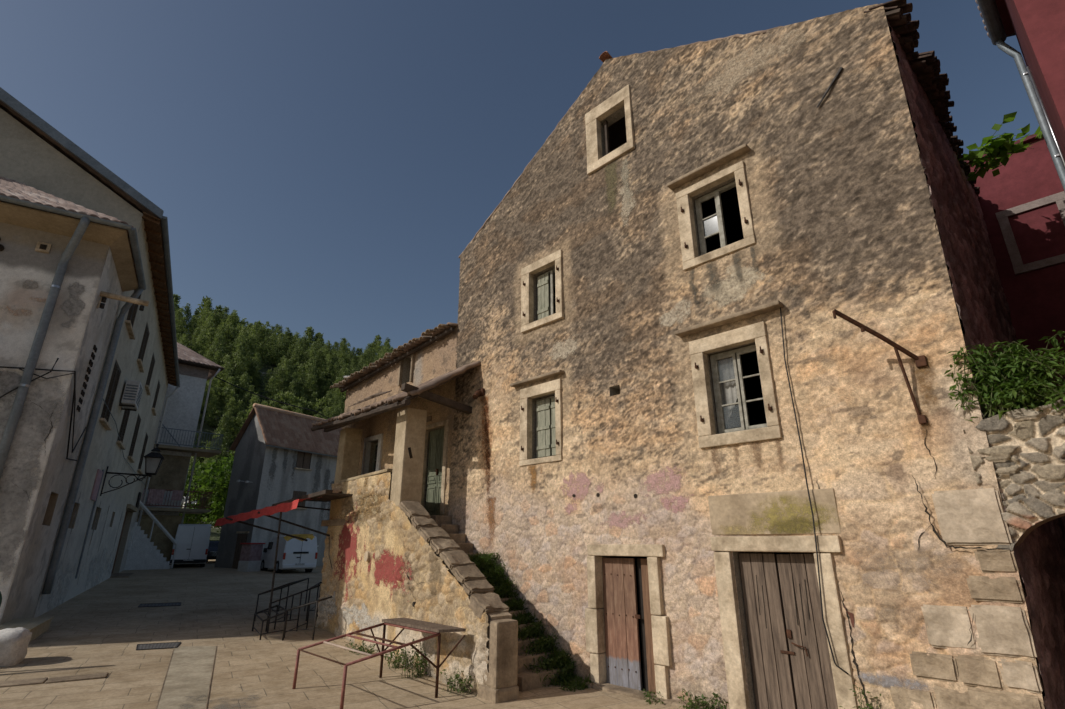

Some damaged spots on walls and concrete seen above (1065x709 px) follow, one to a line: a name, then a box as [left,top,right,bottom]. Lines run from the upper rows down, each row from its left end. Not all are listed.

crack [912,429,1008,550]
crack [840,591,868,708]